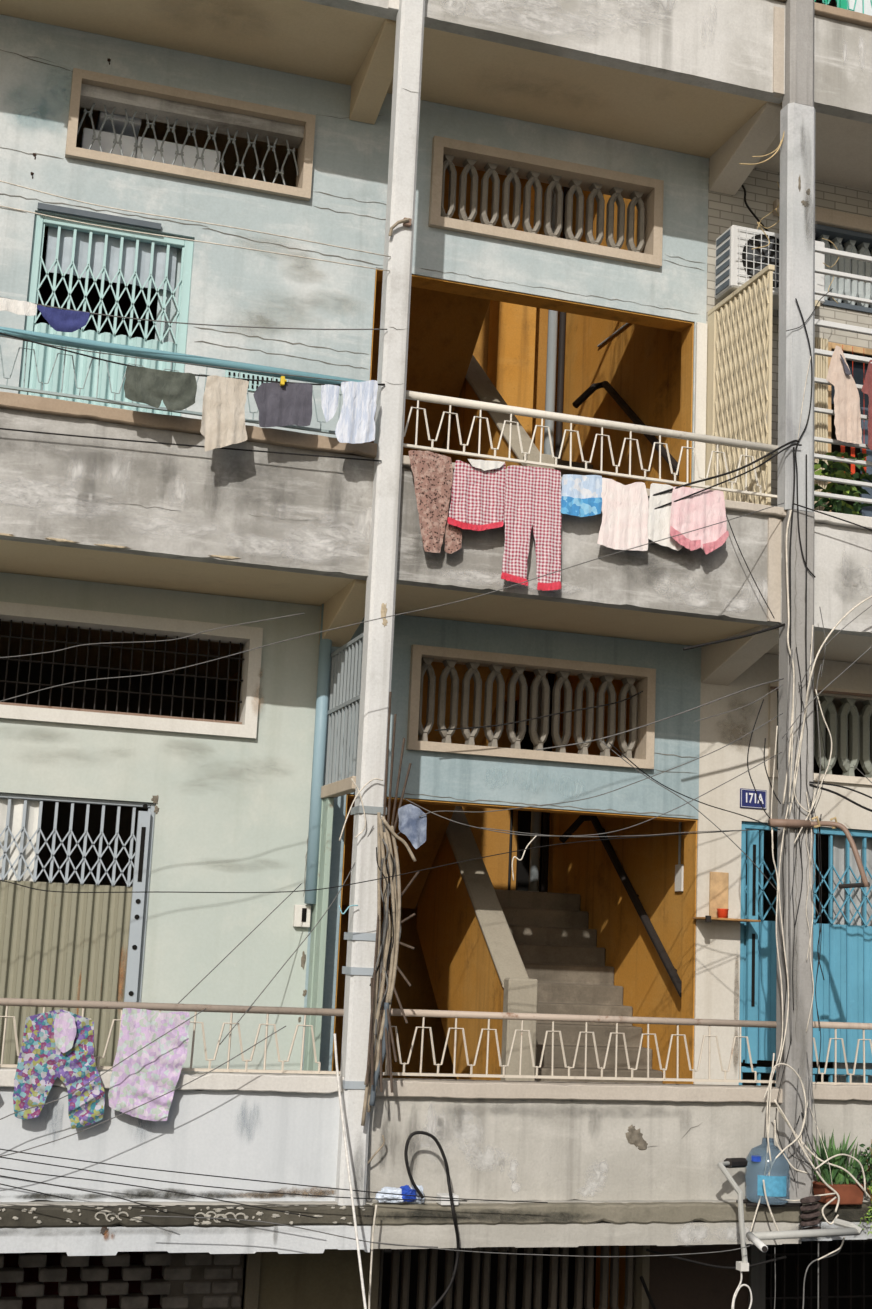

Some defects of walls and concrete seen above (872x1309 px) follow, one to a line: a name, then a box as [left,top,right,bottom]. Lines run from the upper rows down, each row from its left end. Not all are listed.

leakage [0,457,129,516]
leakage [230,510,372,559]
spalling [625,1125,648,1150]
peeling [0,1206,42,1224]
peeling [63,1205,167,1235]
peeling [189,1205,365,1225]